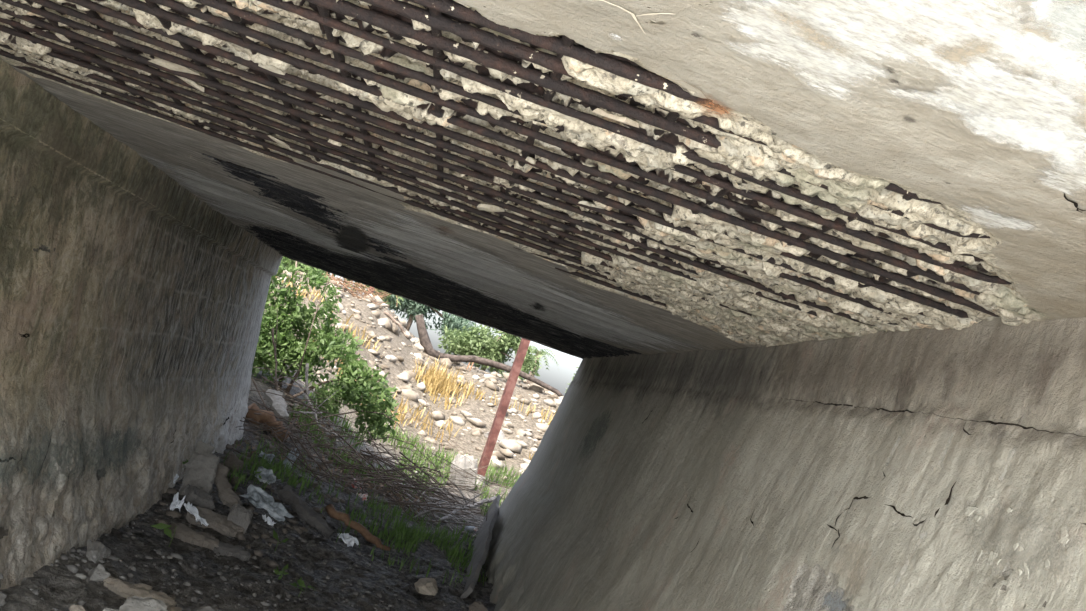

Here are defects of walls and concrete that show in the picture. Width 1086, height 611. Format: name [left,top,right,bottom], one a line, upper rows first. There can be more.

water stain [0,84,762,407]
spalling [0,0,1049,359]
water stain [723,0,1086,195]
crack [1063,192,1086,213]
crack [827,472,956,549]
crack [777,397,1086,437]